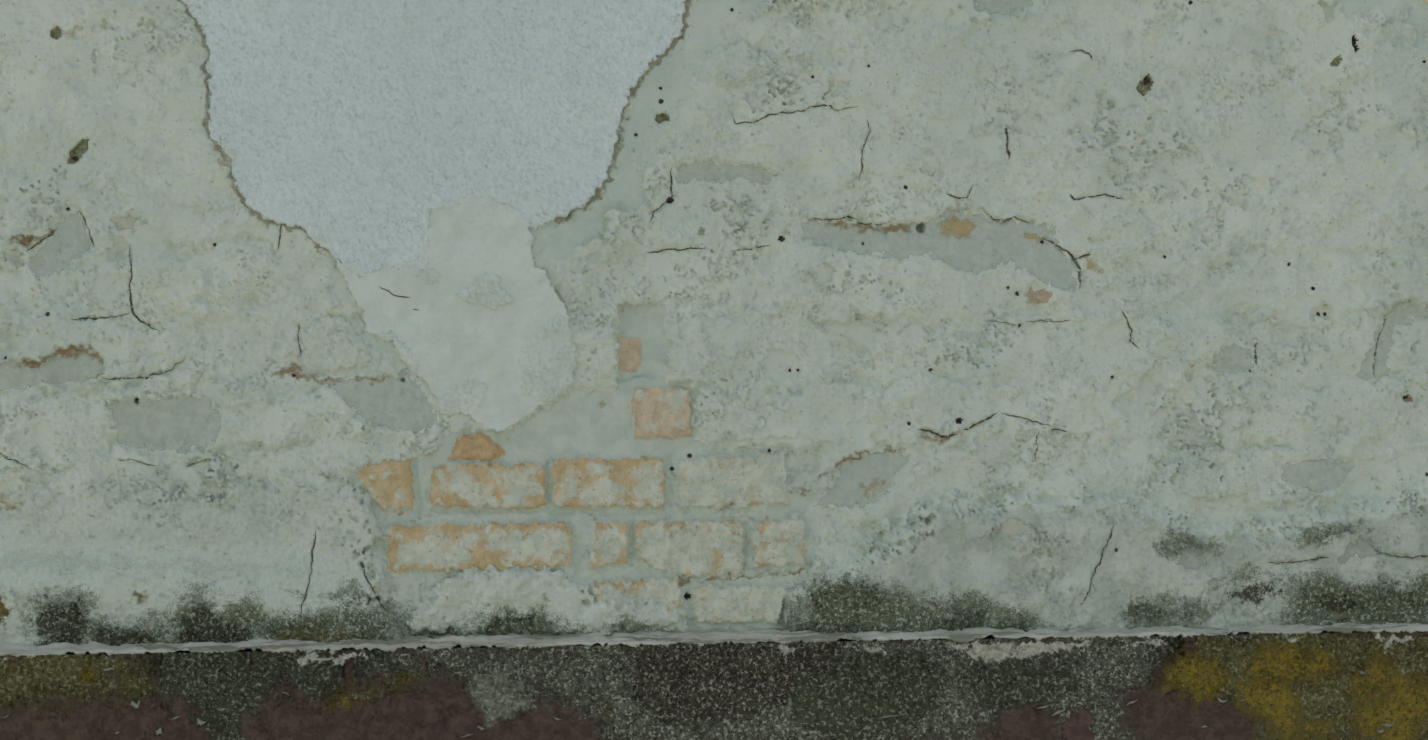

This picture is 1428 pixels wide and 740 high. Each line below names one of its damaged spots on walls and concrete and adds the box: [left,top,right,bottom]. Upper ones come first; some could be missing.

spalling [676,159,778,185]
crack [26,212,94,252]
crack [69,251,160,332]
spalling [801,207,1078,303]
crack [946,184,1091,285]
crack [105,360,184,380]
spalling [1357,299,1428,381]
spalling [304,193,909,637]
crack [299,530,316,620]
crack [362,563,389,614]
crack [1267,556,1327,564]
leakage [18,562,1428,740]